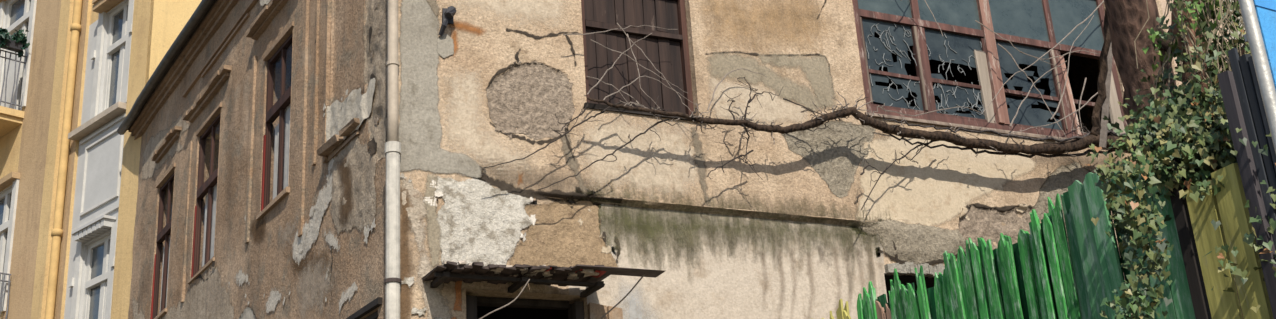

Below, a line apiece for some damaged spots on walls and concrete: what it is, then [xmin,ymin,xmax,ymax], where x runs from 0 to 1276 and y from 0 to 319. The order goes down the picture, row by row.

corrosion [450,22,483,53]
crack [487,28,580,88]
crack [706,51,834,94]
flaking render [228,0,388,319]
peeling [400,60,618,319]
crack [481,119,623,263]
peeling [585,120,699,195]
water stain [589,195,882,253]
flaking render [711,78,876,198]
flaking render [959,162,1114,250]